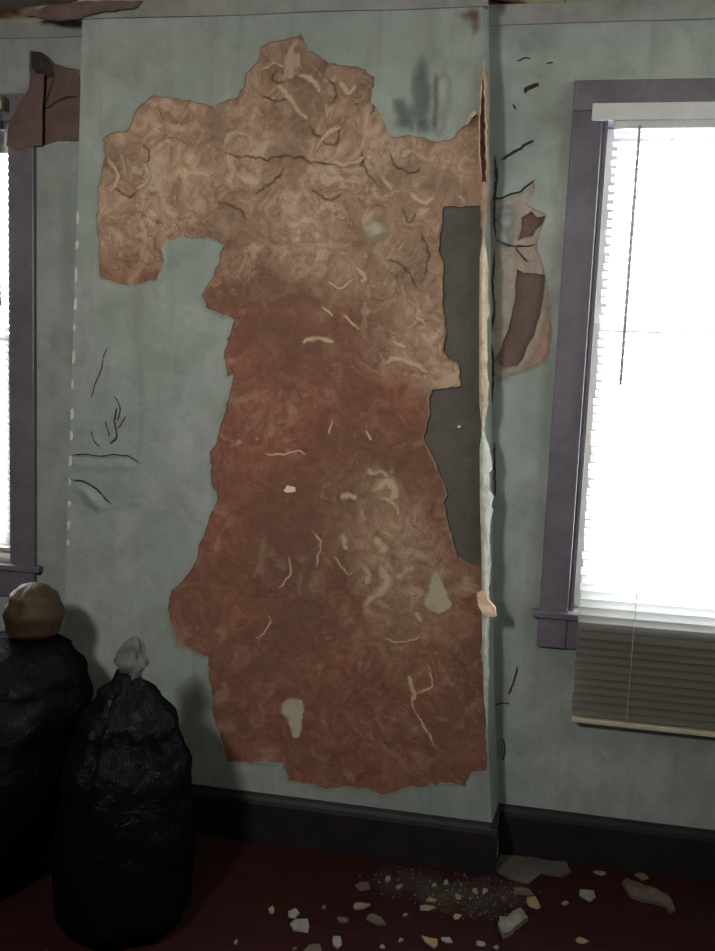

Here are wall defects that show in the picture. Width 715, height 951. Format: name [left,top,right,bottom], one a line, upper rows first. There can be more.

water stain [397,70,437,127]
crack [513,57,554,110]
crack [466,59,536,402]
peeling [94,32,555,799]
crack [491,441,499,495]